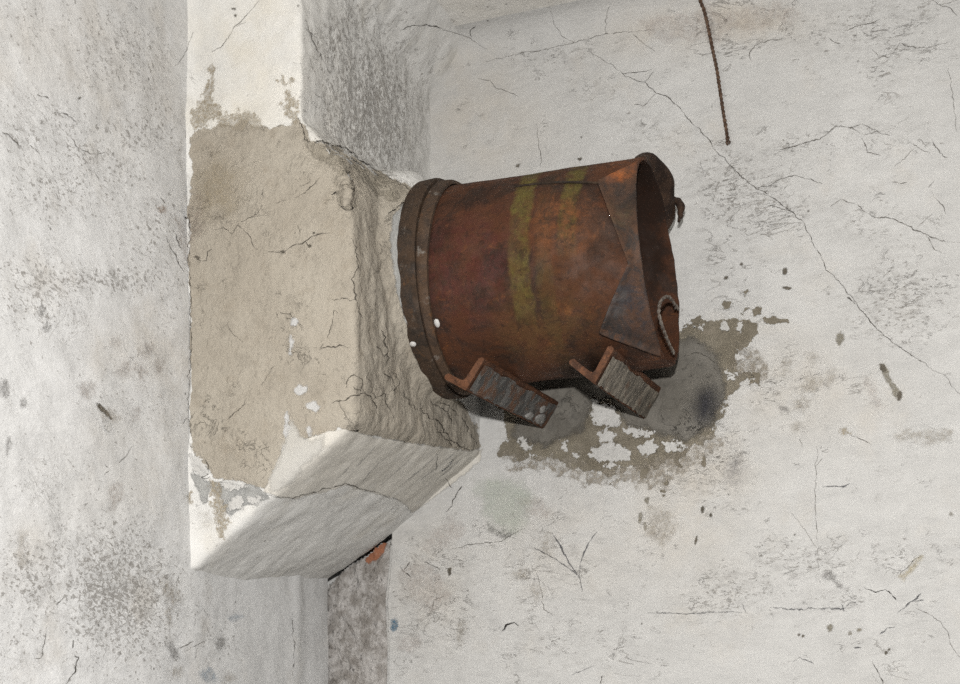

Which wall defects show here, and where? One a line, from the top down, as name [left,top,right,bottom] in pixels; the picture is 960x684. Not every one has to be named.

crack [155,117,409,479]
peeling [187,65,481,539]
crack [280,238,477,450]
flaking render [497,289,789,503]
crack [404,6,960,395]